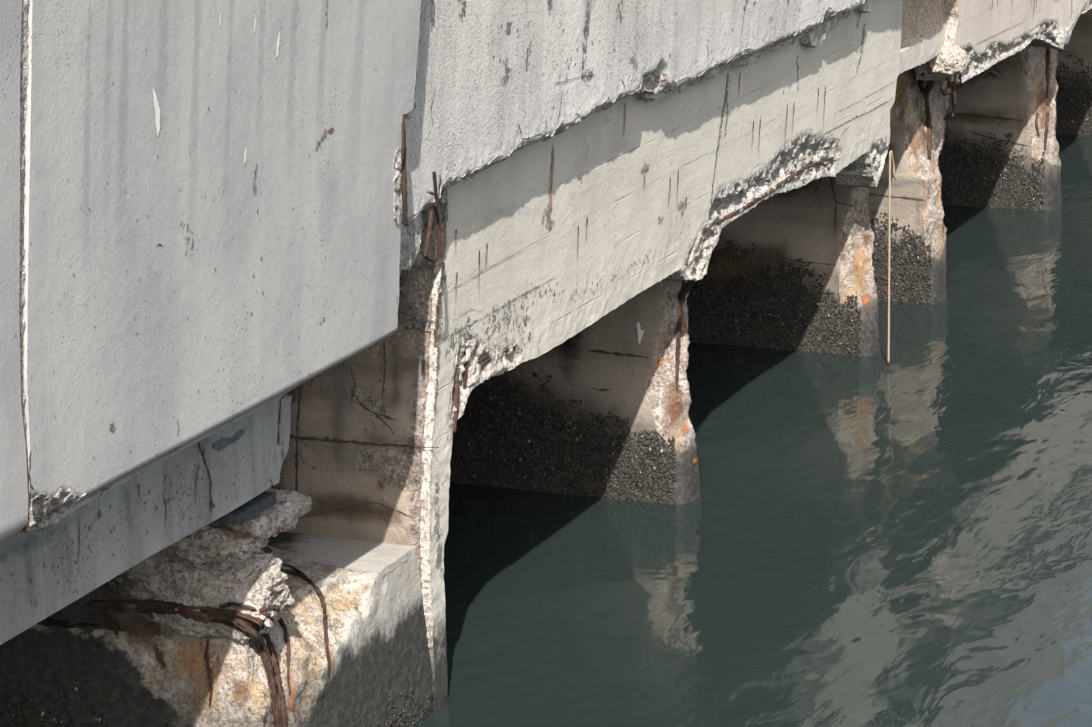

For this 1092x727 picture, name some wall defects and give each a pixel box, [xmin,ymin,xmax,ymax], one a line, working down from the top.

spalling [392,0,866,263]
crack [707,5,746,205]
spalling [918,0,1092,159]
spalling [664,133,889,390]
spalling [449,334,523,438]
rust [668,388,688,433]
spalling [19,484,111,533]
spalling [71,589,292,727]
spalling [281,563,331,675]